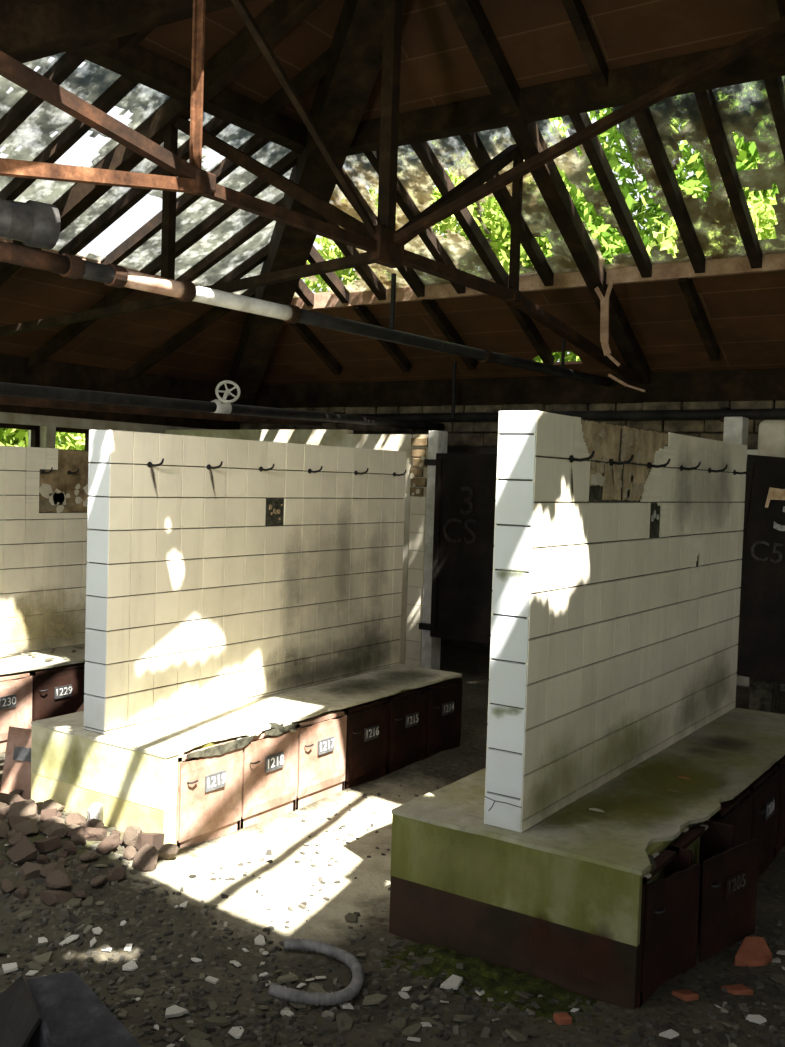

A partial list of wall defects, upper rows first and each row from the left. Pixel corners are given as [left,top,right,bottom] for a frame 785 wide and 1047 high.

spalling [39,449,91,513]
spalling [581,420,668,536]